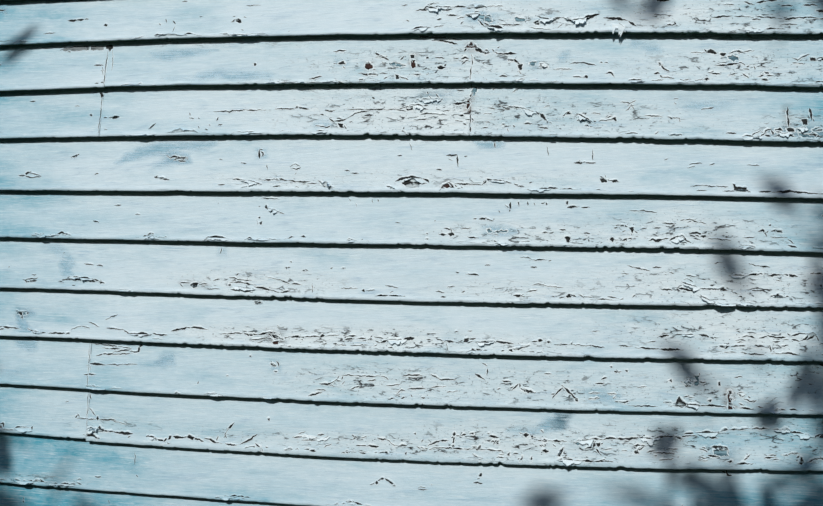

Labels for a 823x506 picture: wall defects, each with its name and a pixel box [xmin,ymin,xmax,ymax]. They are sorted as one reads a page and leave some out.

spalling [690,48,755,63]
peeling [311,91,474,134]
spalling [395,174,430,188]
spalling [425,217,509,246]
peeling [179,273,314,305]
peeling [660,278,756,306]
peeling [426,329,562,354]
peeling [718,332,823,367]
peeling [615,373,726,410]
peeling [75,408,133,441]
peeling [146,433,204,446]
peeling [471,425,823,485]